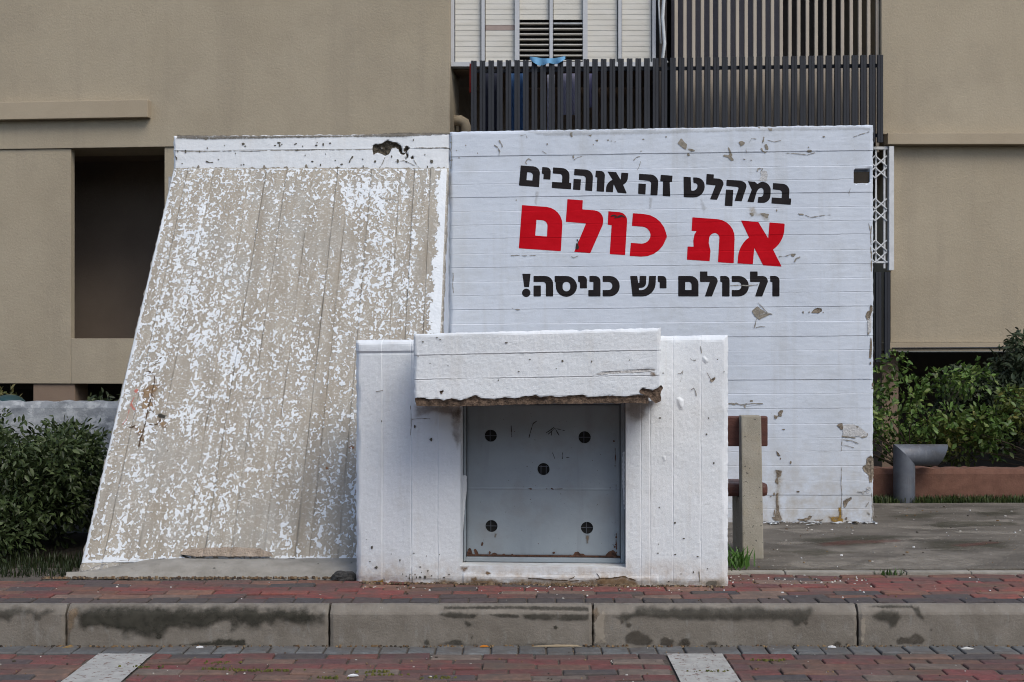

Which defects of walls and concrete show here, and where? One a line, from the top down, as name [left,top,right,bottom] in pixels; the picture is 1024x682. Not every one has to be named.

peeling [752,304,772,328]
peeling [82,139,447,569]
spalling [415,359,664,407]
spalling [763,451,877,525]
corrosion [462,542,637,586]
water stain [79,607,321,638]
water stain [621,607,811,645]